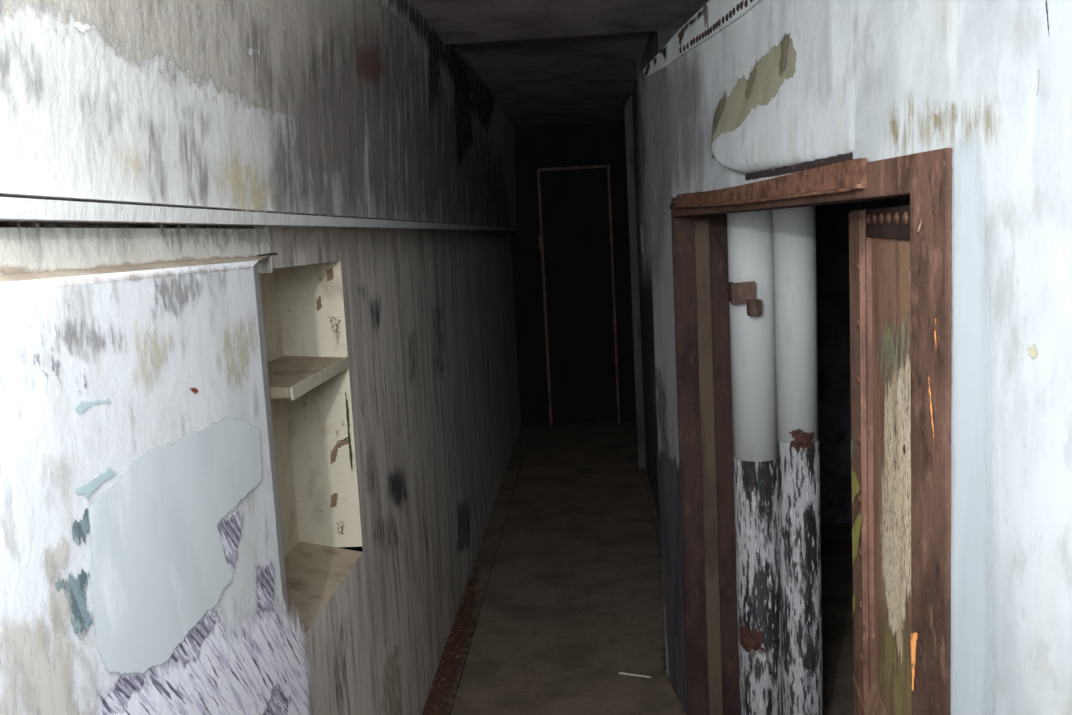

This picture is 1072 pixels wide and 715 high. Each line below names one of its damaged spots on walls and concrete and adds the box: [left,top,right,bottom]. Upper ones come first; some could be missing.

peeling [711,35,796,159]
peeling [316,296,341,337]
peeling [331,440,348,464]
rust [789,429,815,452]
peeling [0,467,310,715]
rust [739,625,765,653]